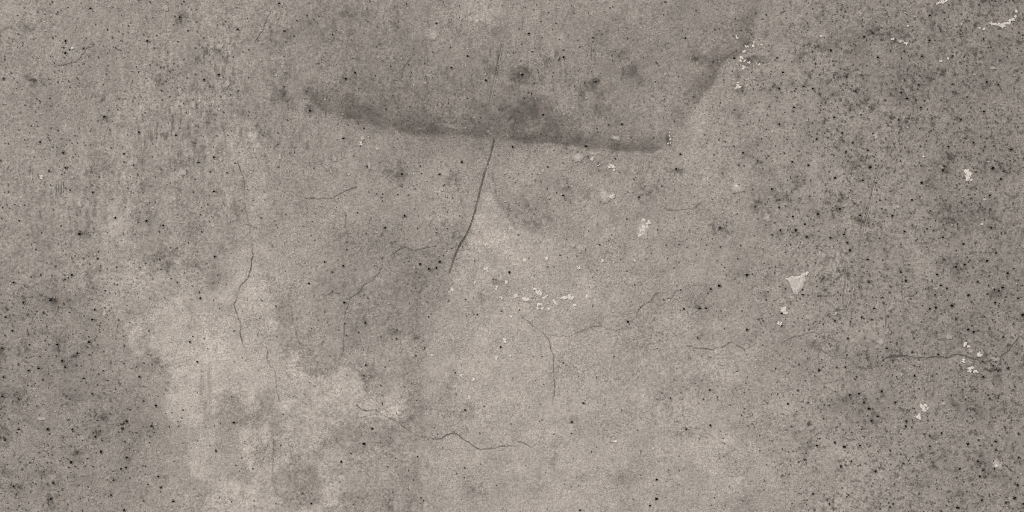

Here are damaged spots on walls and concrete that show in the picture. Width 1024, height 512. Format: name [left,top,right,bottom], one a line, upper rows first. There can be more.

water stain [300,0,766,158]
crack [233,161,280,402]
crack [322,142,504,356]
water stain [94,110,795,512]
crack [517,289,680,403]
spalling [785,271,809,295]
crack [271,441,280,497]
crack [352,404,537,450]
water stain [766,388,802,426]